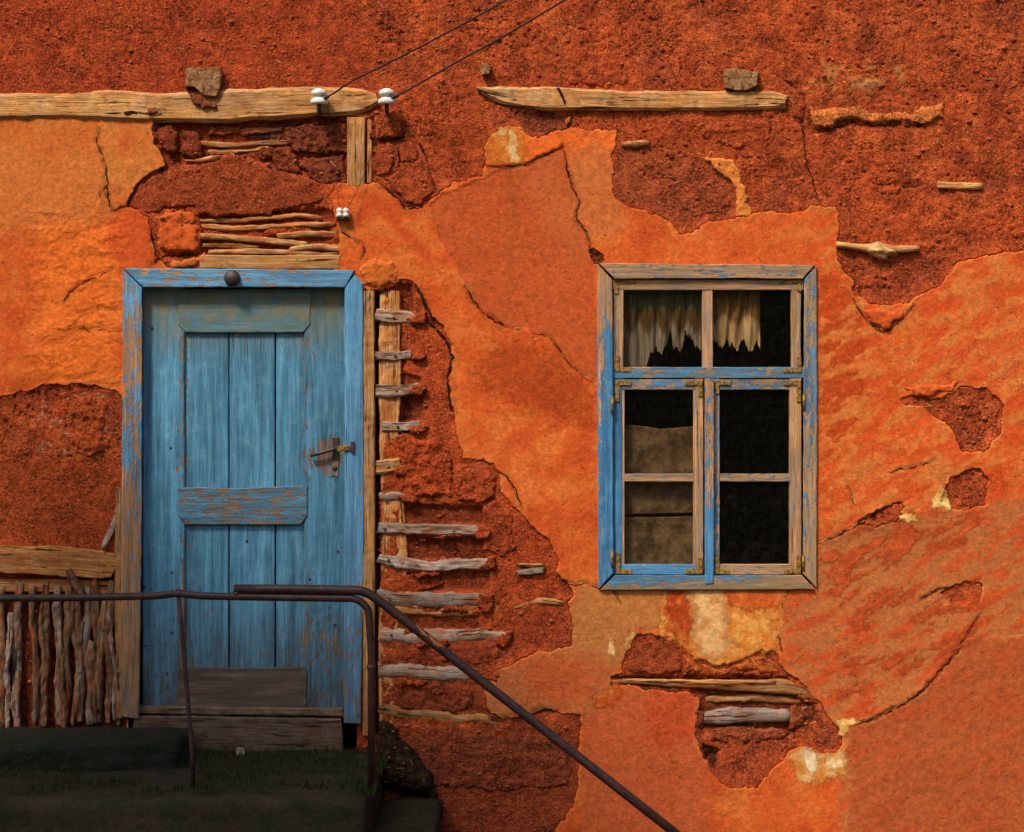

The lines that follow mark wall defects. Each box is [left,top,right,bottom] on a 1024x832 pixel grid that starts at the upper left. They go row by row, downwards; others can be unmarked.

spalling [357,279,582,832]